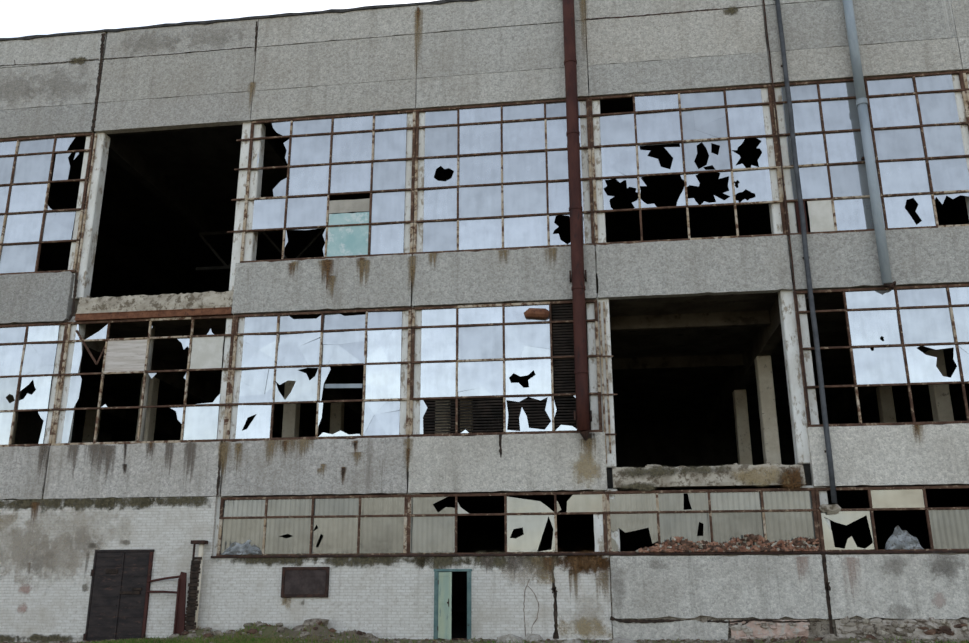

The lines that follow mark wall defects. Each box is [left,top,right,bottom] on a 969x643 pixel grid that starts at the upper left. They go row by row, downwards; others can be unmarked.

corrosion [320,259,335,296]
corrosion [358,257,370,281]
spalling [76,291,234,314]
corrosion [38,445,48,469]
corrosion [219,442,242,475]
corrosion [266,439,313,458]
spalling [612,462,806,488]
crack [523,556,559,639]
spalling [728,620,810,640]
spalling [835,616,969,641]